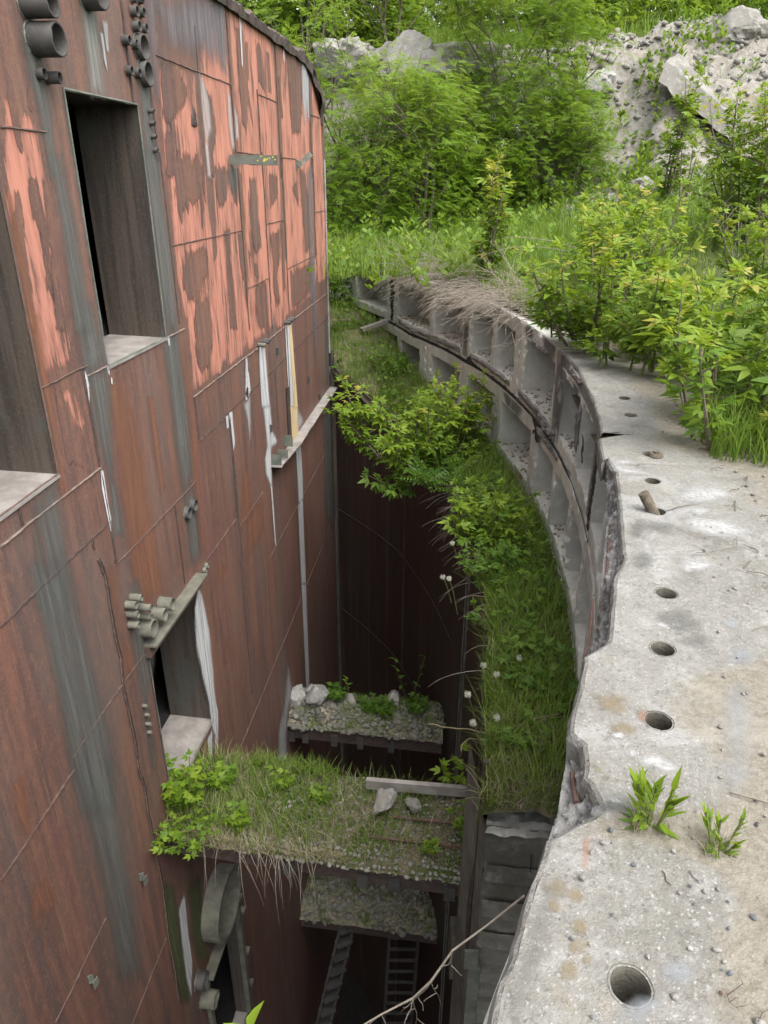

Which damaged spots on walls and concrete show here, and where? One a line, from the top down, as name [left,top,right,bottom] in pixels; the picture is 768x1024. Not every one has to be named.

peeling [236,26,303,134]
peeling [160,58,312,332]
leakage [140,1,226,558]
peeling [180,242,213,376]
leakage [226,412,235,450]
leakage [245,347,276,545]
crack [531,420,539,442]
crack [581,432,618,532]
spalling [582,463,627,660]
leakage [34,490,138,974]
spalling [552,749,606,838]